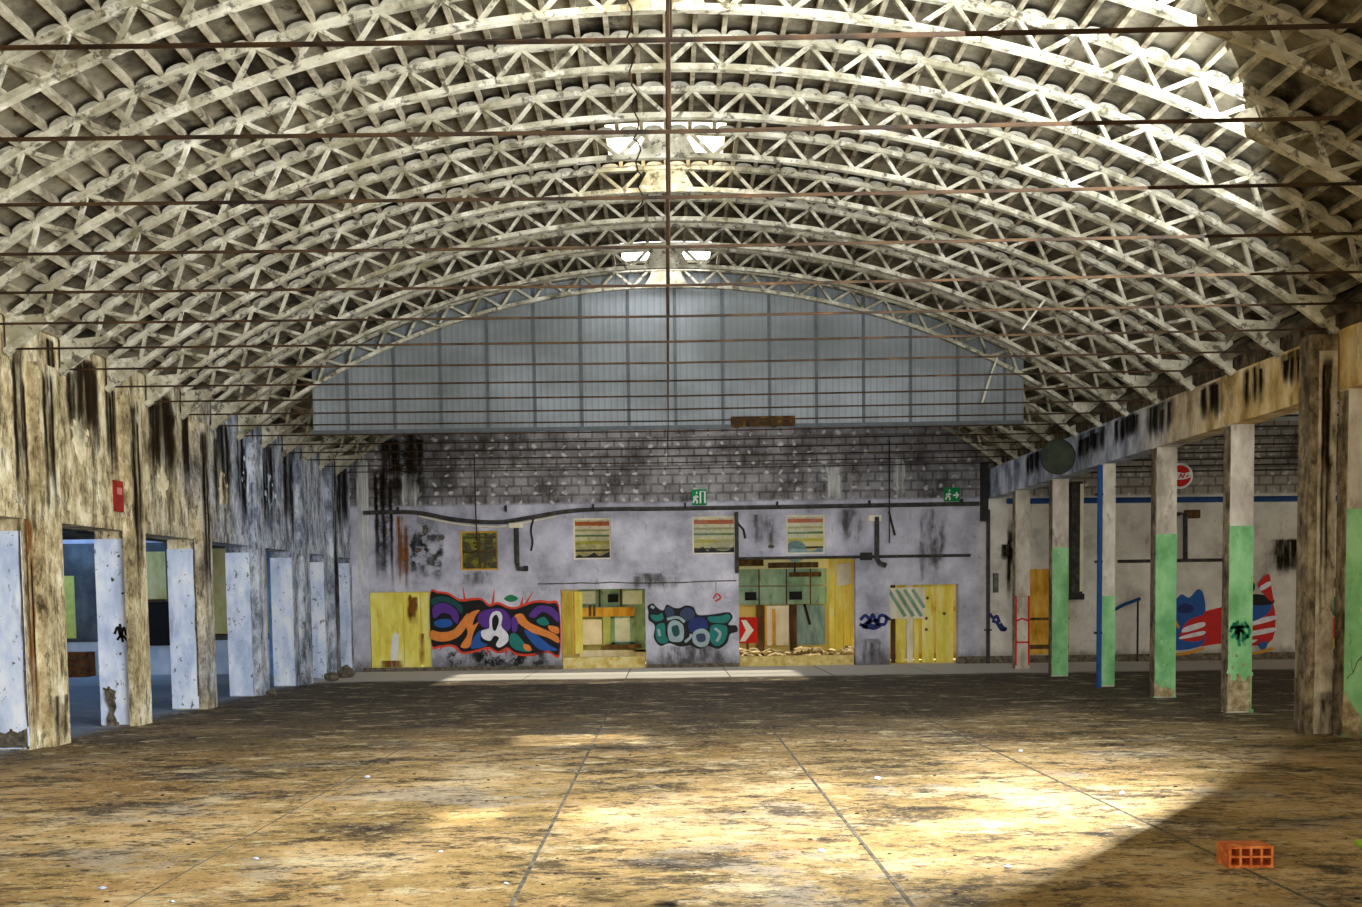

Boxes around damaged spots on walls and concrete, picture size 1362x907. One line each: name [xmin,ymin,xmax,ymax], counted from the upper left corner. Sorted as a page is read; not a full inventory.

damp [13,350,29,492]
damp [1201,382,1222,415]
damp [1243,366,1262,398]
damp [1281,349,1300,380]
damp [43,338,247,574]
damp [262,446,294,535]
damp [332,435,423,624]
damp [410,529,442,571]
peeling [1341,691,1362,737]